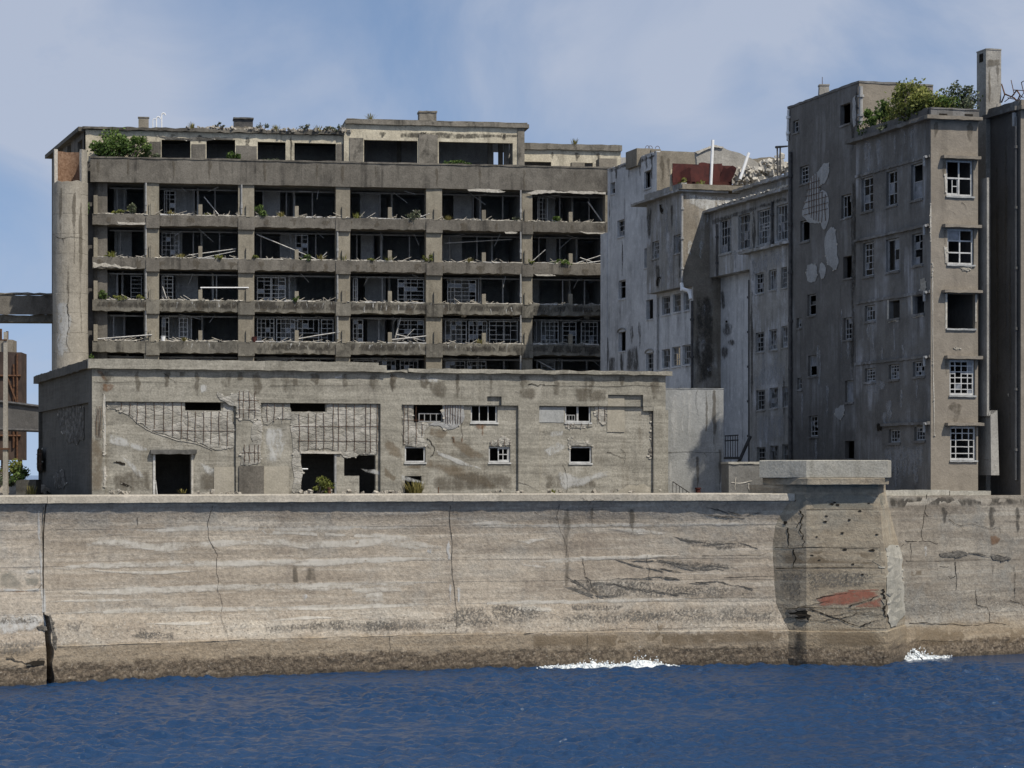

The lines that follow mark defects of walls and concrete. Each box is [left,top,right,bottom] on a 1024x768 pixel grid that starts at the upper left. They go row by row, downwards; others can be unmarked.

peeling [802,163,839,283]
leakage [696,292,734,380]
spalling [96,390,379,493]
spalling [402,405,465,447]
leakage [436,453,508,489]
leakage [547,473,602,488]
crack [95,506,247,657]
crack [367,506,459,653]
crack [508,468,759,654]
crack [702,494,1019,647]